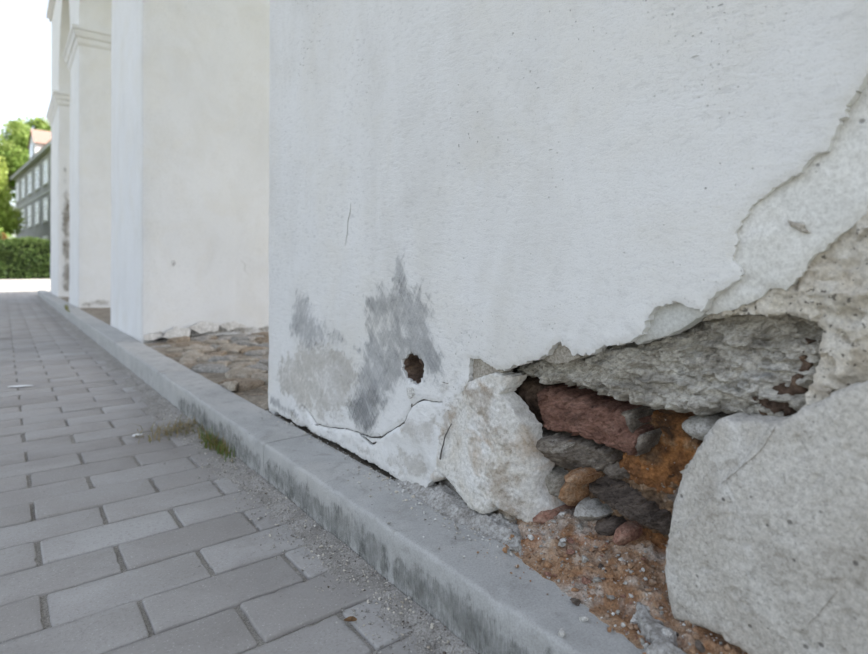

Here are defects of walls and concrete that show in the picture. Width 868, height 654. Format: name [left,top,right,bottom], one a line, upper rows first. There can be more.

crack [316,382,448,444]
spalling [428,214,868,549]